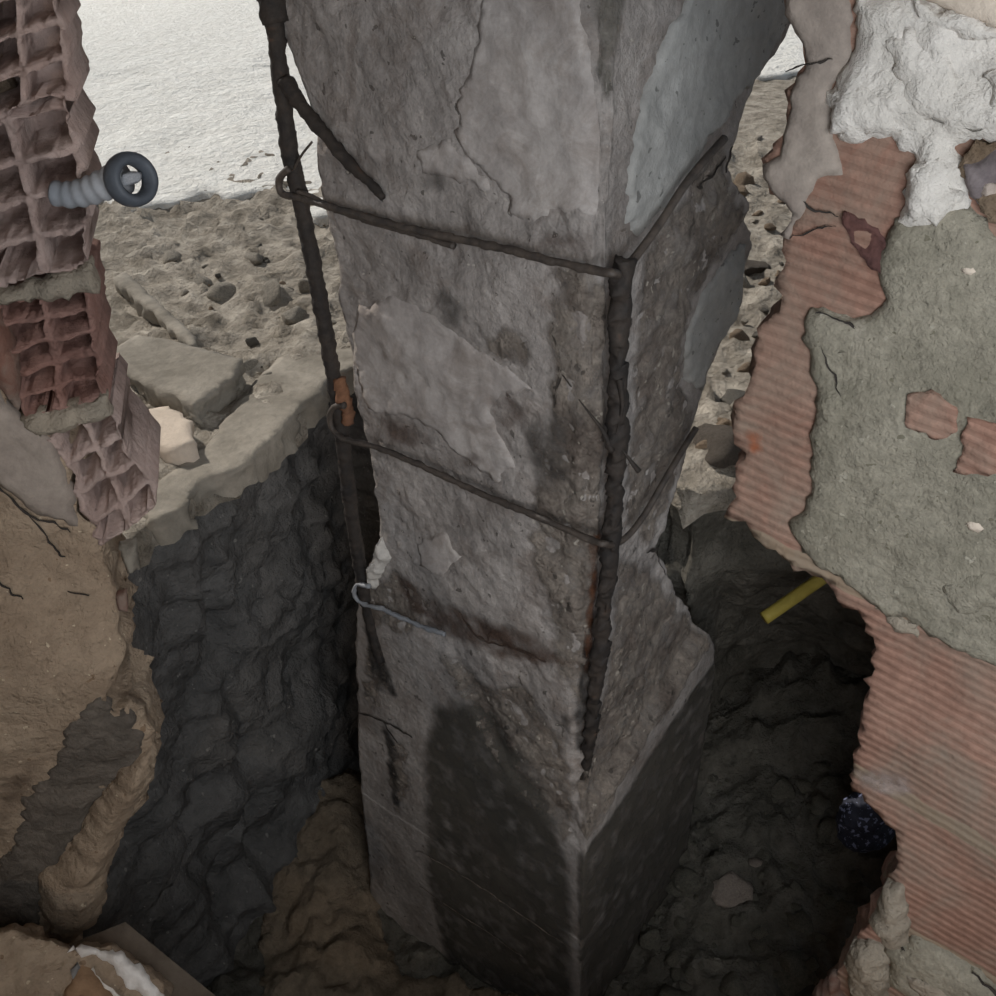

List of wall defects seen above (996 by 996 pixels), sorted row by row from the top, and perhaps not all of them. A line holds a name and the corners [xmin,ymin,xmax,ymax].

peeling [417,0,624,222]
peeling [352,296,531,484]
peeling [624,0,996,666]
crack [0,582,24,599]
crack [0,488,70,557]
corrosion [366,633,395,696]
crack [357,712,412,743]
corrosion [383,730,399,805]
spalling [530,269,606,700]
leakage [426,664,716,996]
corrosion [564,568,598,751]
spalling [604,645,897,996]